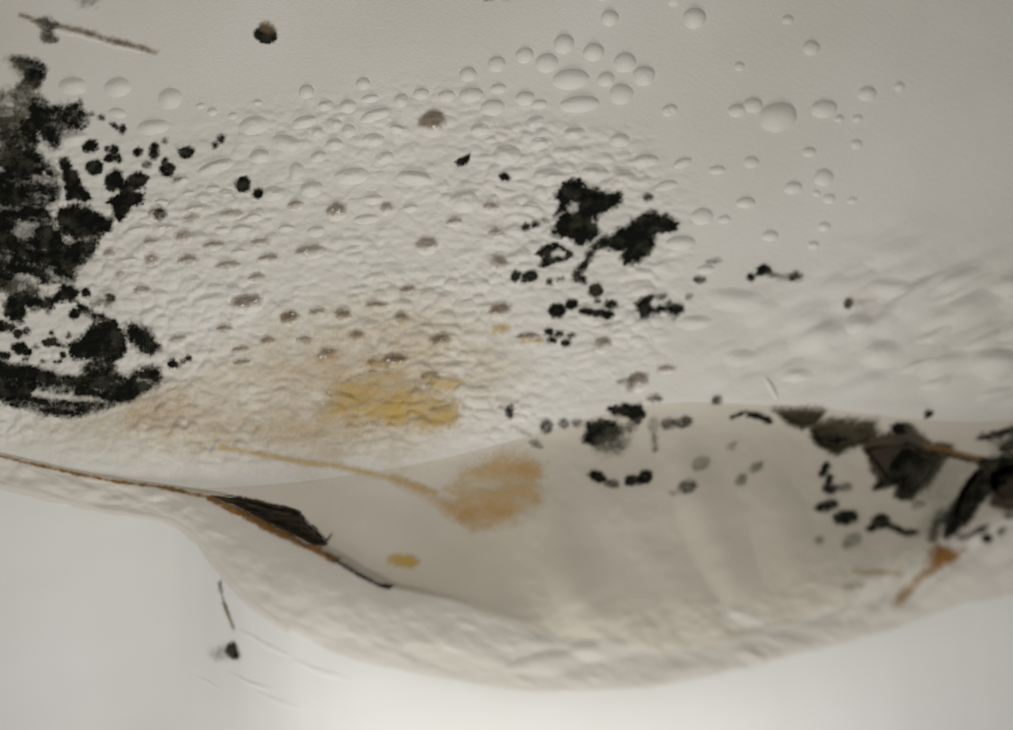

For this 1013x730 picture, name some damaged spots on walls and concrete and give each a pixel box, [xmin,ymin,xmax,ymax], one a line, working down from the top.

damp [0,56,194,418]
damp [511,178,684,347]
damp [326,375,456,425]
damp [541,403,646,452]
damp [662,416,692,429]
damp [589,470,653,487]
damp [678,481,696,493]
damp [813,423,1013,545]
crack [0,455,393,589]